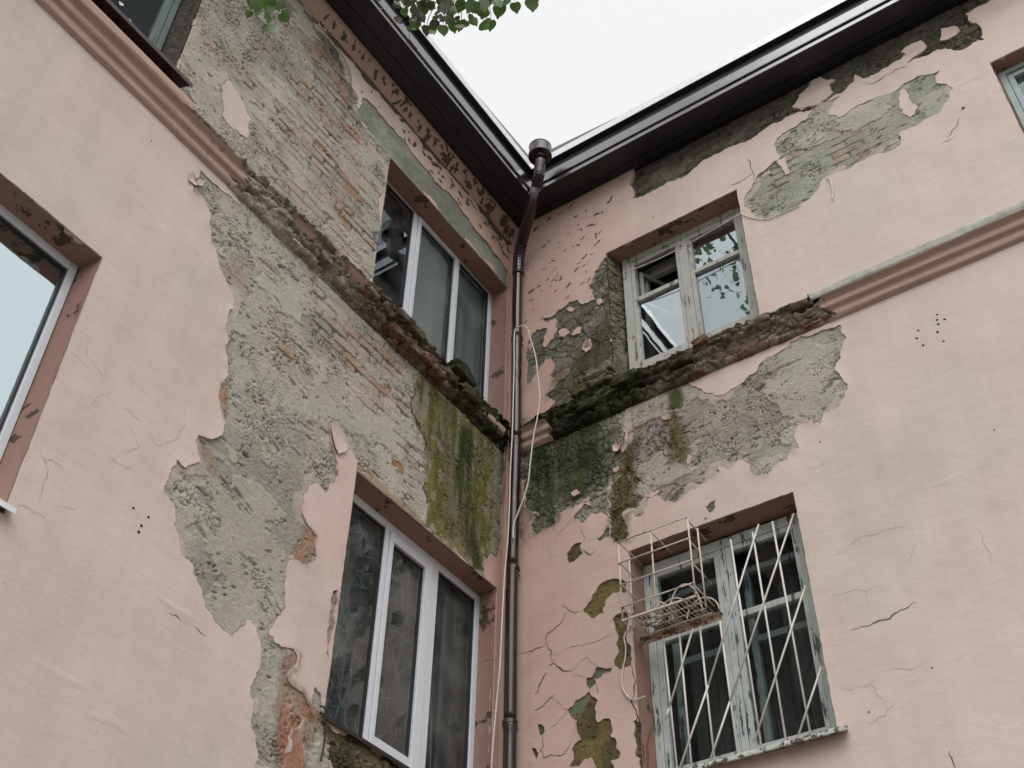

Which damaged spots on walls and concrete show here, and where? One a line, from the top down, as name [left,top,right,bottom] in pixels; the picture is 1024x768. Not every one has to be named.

spalling [744,72,953,221]
spalling [164,0,515,768]
peeling [524,195,640,413]
leakage [611,415,689,540]
spalling [598,326,848,543]
spalling [747,314,771,330]
crack [518,606,606,758]
peeling [568,613,635,768]
peeling [584,579,626,619]
crack [835,582,915,630]